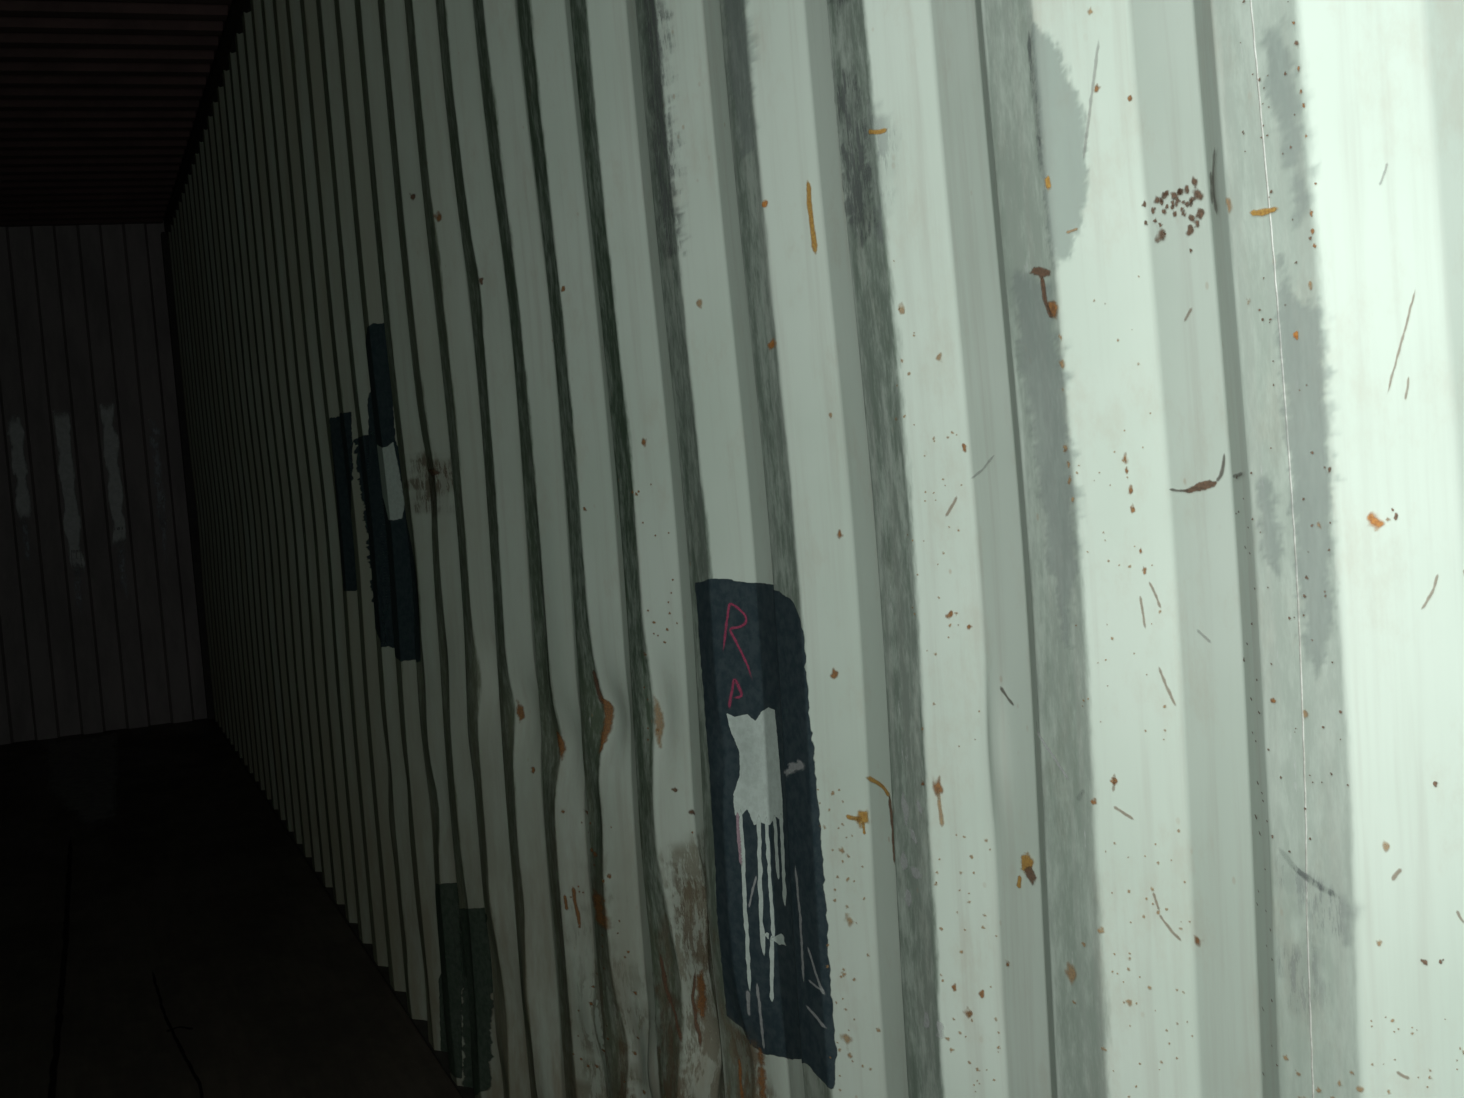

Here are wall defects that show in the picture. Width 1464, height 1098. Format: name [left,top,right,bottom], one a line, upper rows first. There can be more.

corrosion [592,670,614,752]
corrosion [564,848,620,947]
corrosion [656,871,712,1098]
corrosion [731,1031,766,1098]